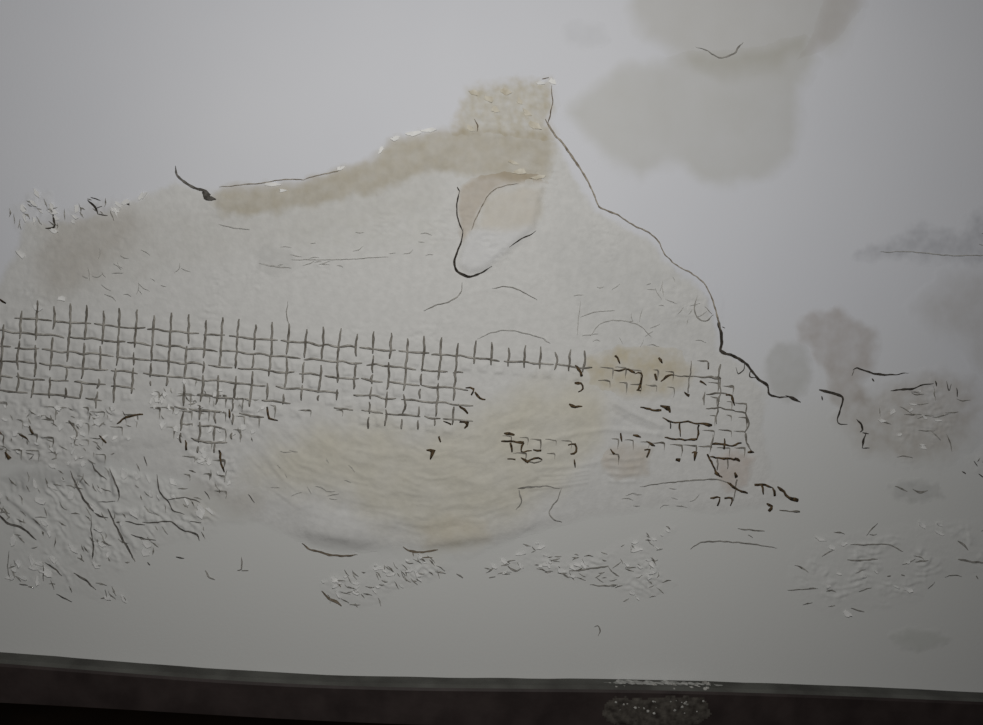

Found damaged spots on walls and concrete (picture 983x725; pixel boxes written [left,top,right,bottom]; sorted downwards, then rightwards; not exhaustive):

damp [558,0,869,195]
crack [424,184,536,311]
crack [543,77,958,448]
flaking render [0,142,631,613]
crack [0,515,35,539]
crack [7,457,210,602]
flaking render [482,352,799,604]
peeling [784,515,983,619]
spalling [602,679,722,725]